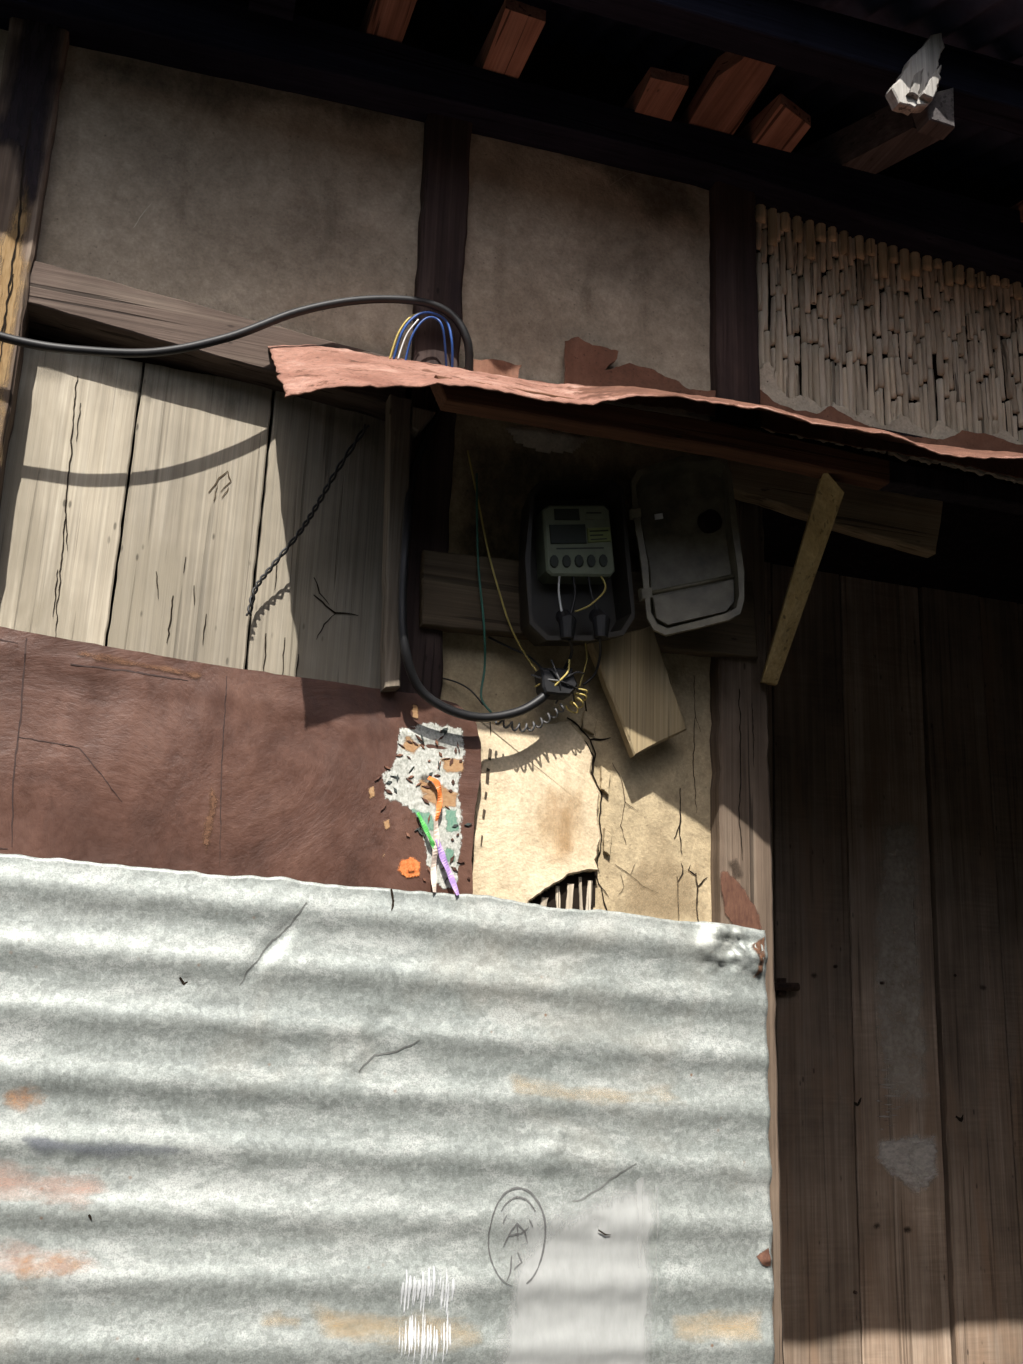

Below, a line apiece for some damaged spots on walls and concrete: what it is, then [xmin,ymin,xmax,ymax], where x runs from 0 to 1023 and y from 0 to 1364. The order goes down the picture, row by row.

rust [399,857,420,878]
peeling [369,711,612,910]
crack [567,677,708,922]
crack [738,689,754,860]